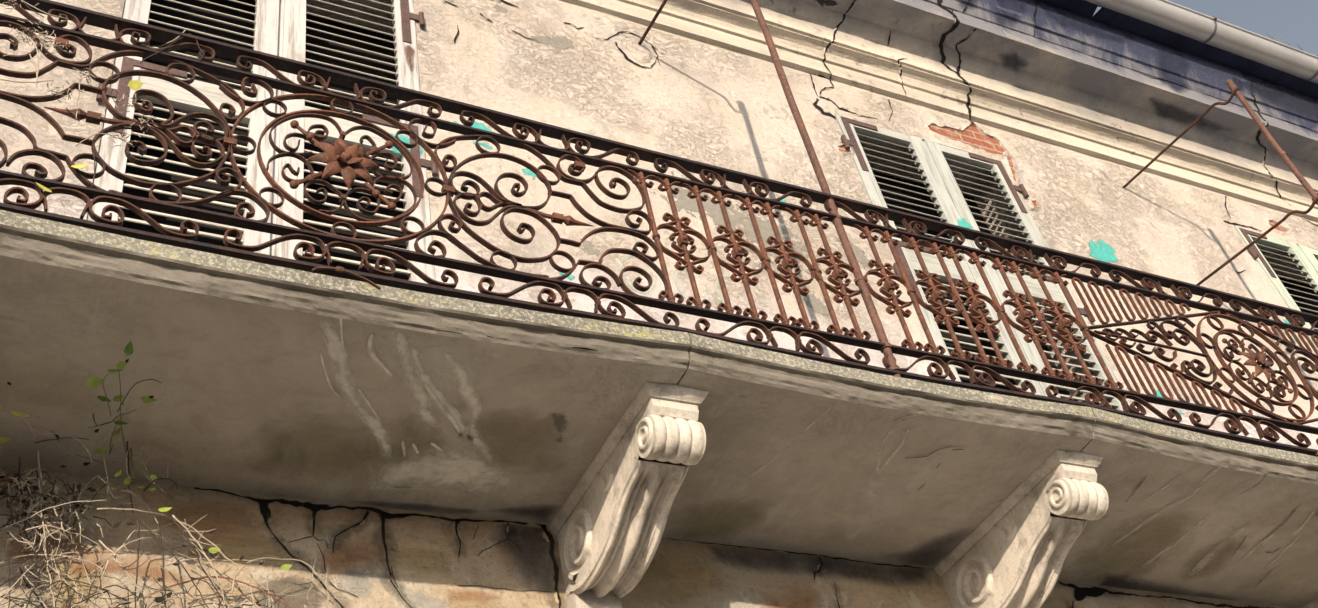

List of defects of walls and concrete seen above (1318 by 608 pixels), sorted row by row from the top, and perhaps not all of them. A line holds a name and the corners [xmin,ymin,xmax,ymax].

crack [445,0,538,43]
peeling [532,33,574,49]
crack [564,22,666,68]
crack [810,0,907,120]
crack [937,0,983,133]
spalling [922,122,1042,212]
water stain [1154,102,1207,126]
crack [1250,76,1318,226]
crack [1223,196,1260,231]
water stain [320,317,511,492]
crack [194,487,561,608]